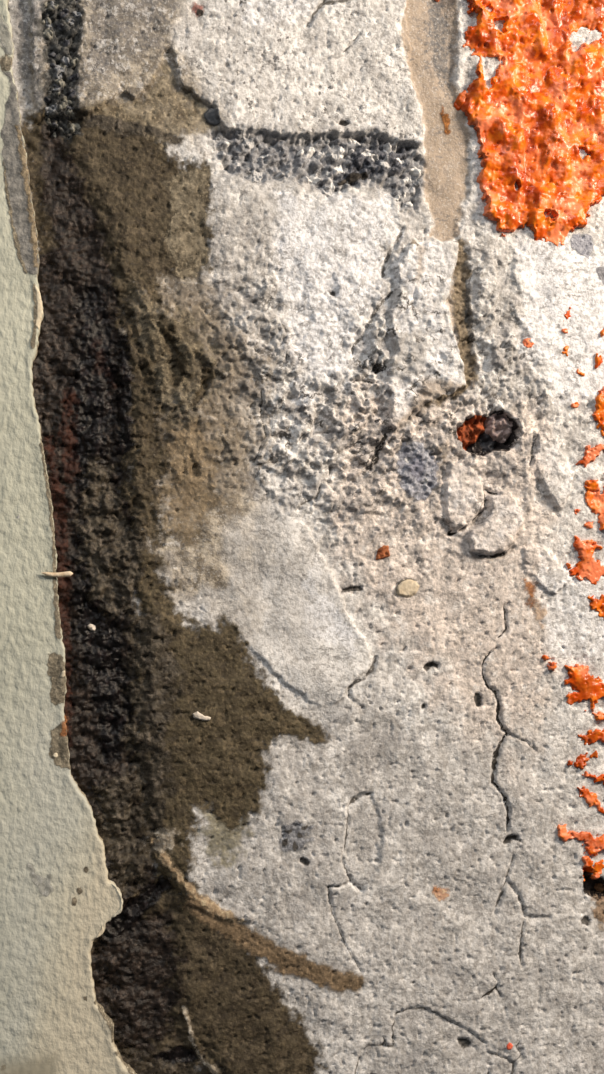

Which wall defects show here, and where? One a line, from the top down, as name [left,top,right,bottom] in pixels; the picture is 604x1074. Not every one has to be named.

spalling [34,0,86,145]
rust [440,107,451,134]
peeling [0,14,44,348]
damp [464,288,475,340]
damp [21,65,364,1074]
peeling [47,653,66,705]
peeling [49,721,71,769]
crack [348,659,376,696]
crack [482,607,534,829]
crack [327,793,371,971]
crack [496,857,531,961]
crack [355,1007,521,1074]